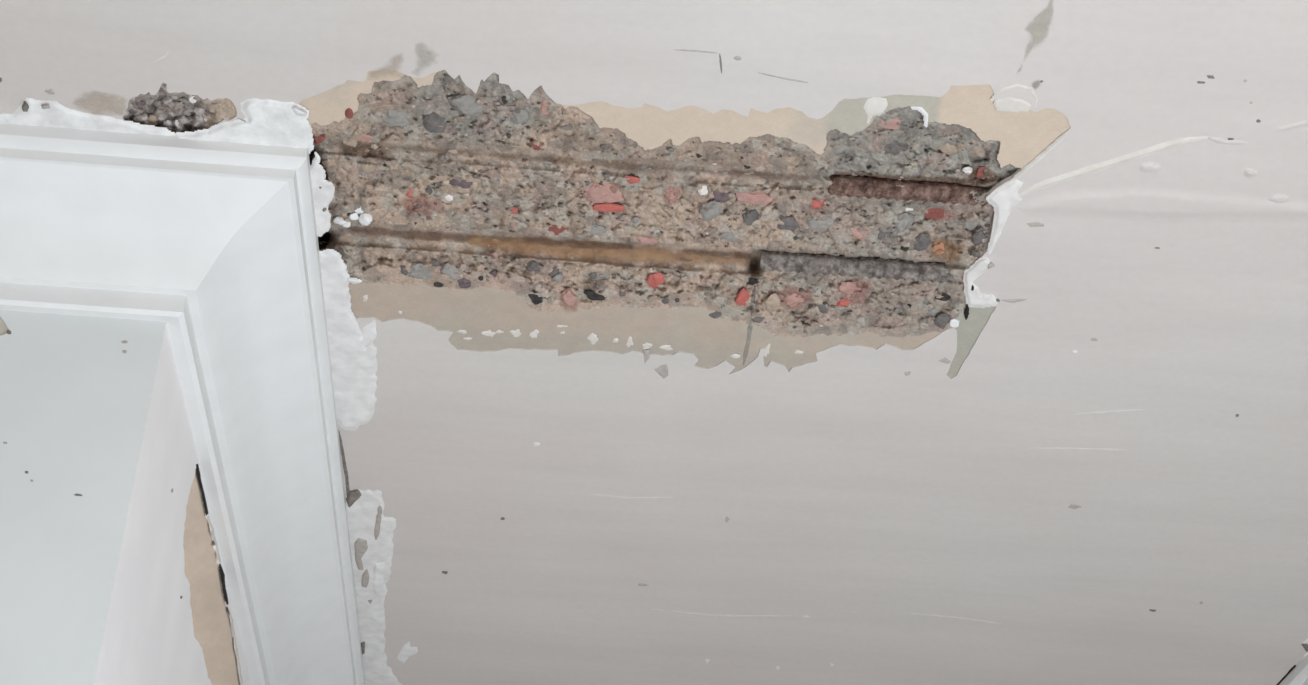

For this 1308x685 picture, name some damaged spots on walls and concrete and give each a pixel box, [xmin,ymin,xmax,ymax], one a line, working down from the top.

spalling [123,83,237,133]
rust [855,172,999,185]
rust [352,228,750,264]
spalling [299,69,1070,379]
peeling [180,471,243,685]